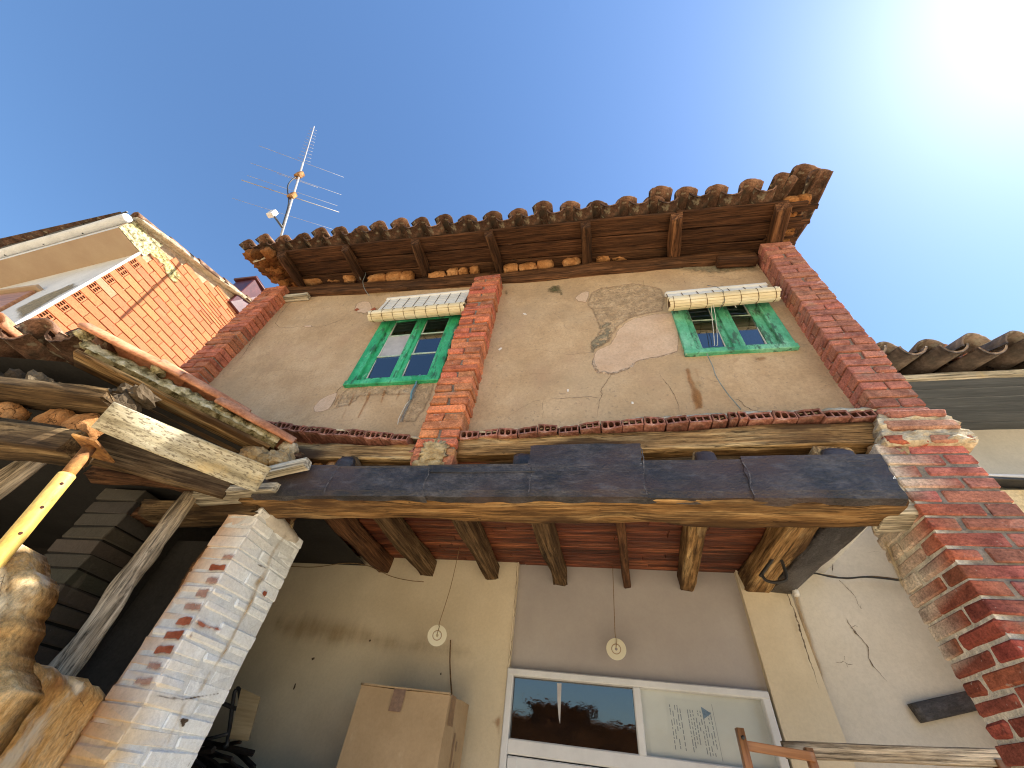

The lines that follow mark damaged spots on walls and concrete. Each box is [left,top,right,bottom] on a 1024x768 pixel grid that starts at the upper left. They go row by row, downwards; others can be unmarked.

flaking render [576,284,678,375]
spalling [314,383,433,422]
crack [787,594,818,684]
crack [832,566,883,677]